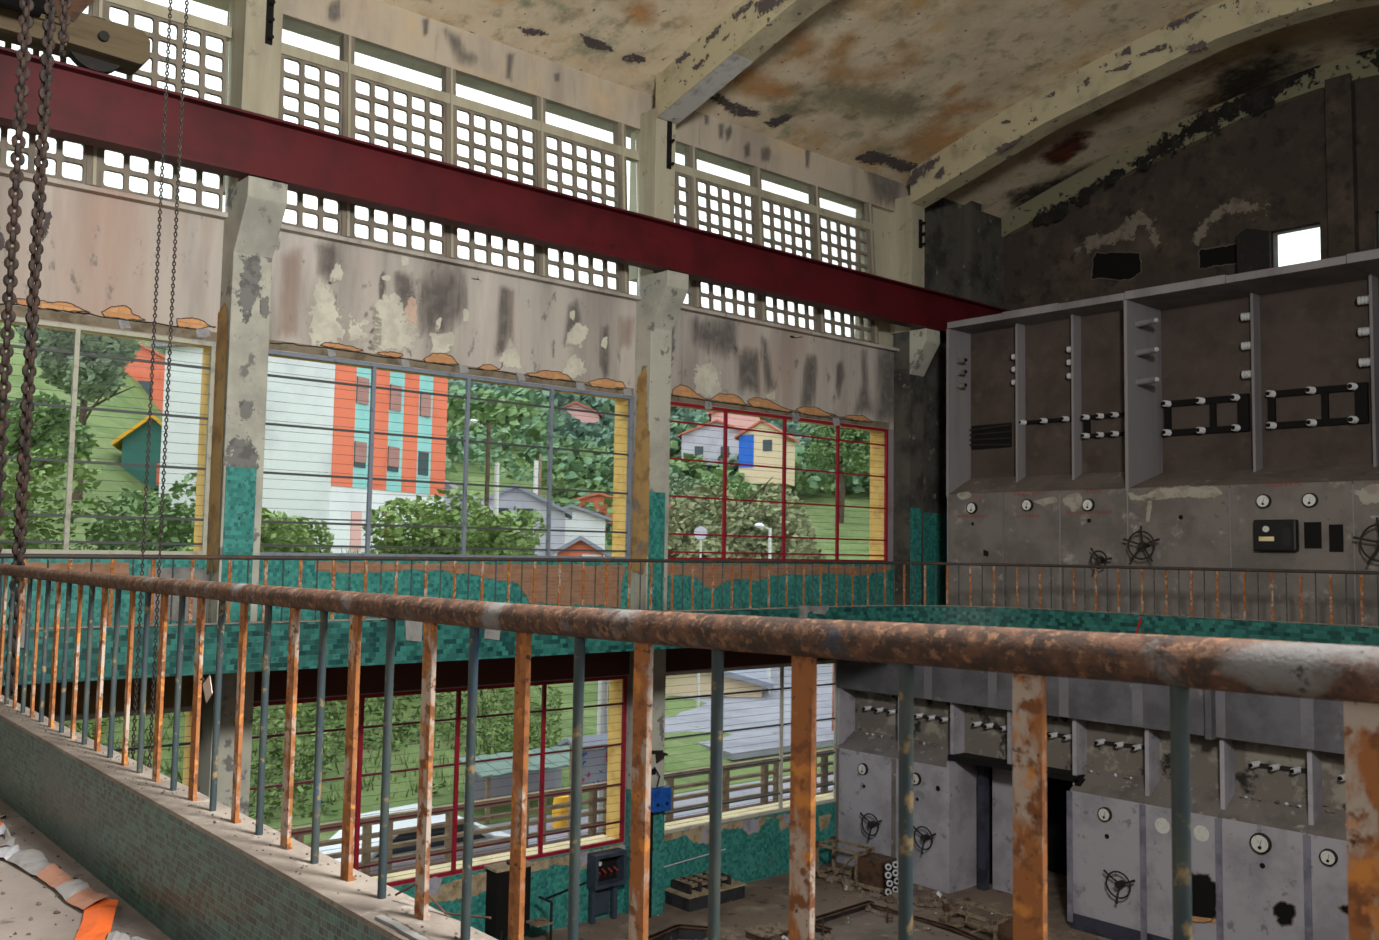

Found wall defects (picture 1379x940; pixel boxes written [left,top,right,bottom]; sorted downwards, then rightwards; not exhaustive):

peeling [1081,10,1209,86]
damp [817,91,918,117]
peeling [1026,65,1321,227]
damp [869,172,898,202]
damp [321,245,336,276]
flaking render [16,298,145,321]
damp [380,274,460,326]
damp [498,289,508,352]
damp [567,304,578,333]
flaking render [147,254,272,621]
spalling [1192,872,1218,924]
spalling [1272,901,1296,927]